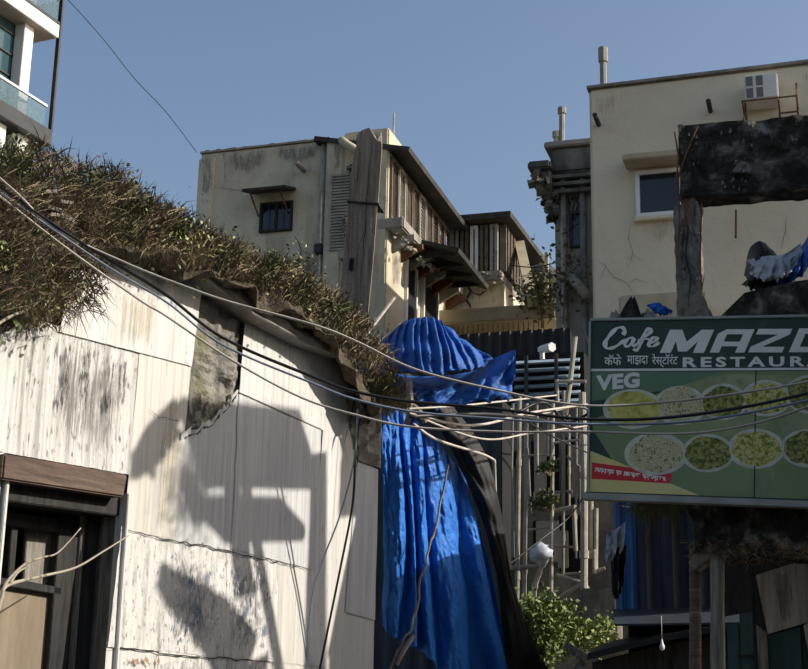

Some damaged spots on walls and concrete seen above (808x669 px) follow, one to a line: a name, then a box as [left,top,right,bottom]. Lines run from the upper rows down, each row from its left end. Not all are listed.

leakage [60,344,127,443]
peeling [184,295,242,439]